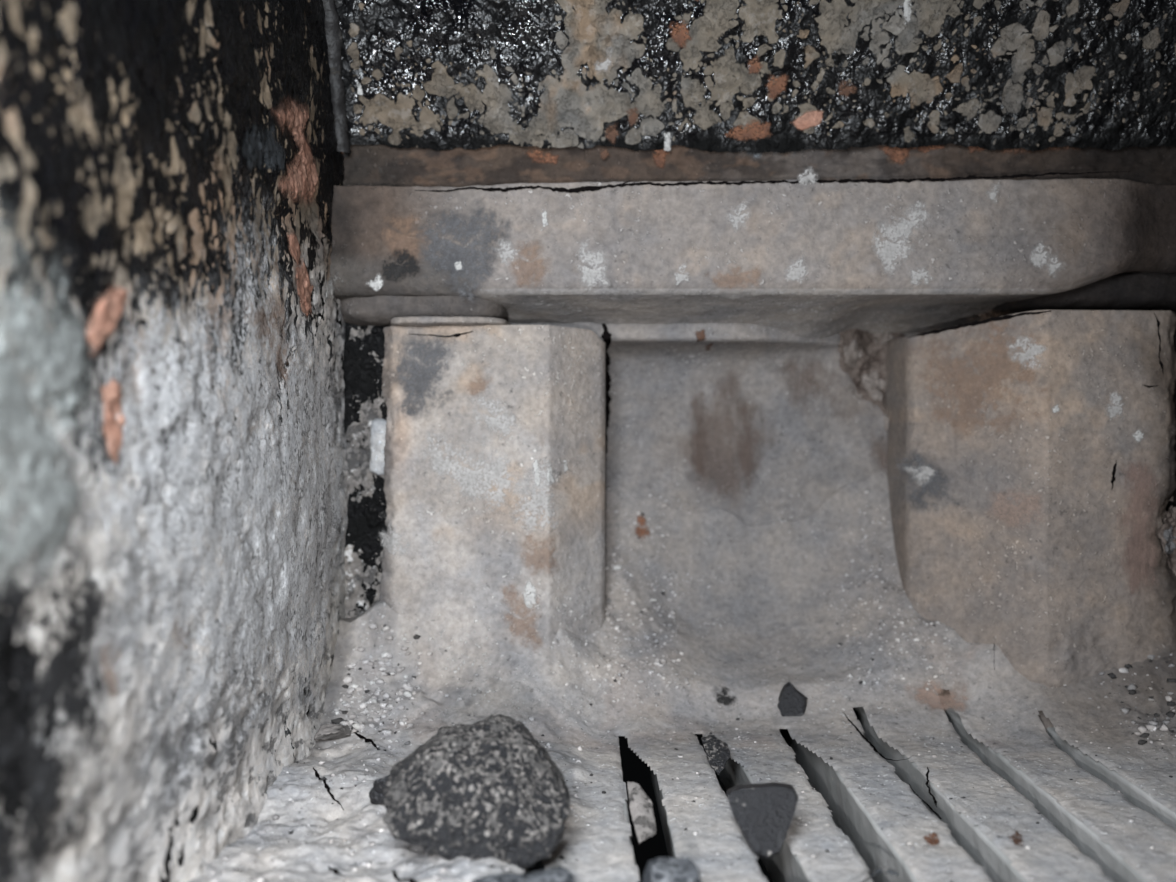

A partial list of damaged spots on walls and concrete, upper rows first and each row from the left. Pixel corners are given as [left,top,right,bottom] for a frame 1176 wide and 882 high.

corrosion [276,106,318,200]
crack [418,171,1130,193]
corrosion [288,234,313,316]
corrosion [88,287,127,349]
spalling [0,270,92,592]
corrosion [101,379,125,464]
crack [601,323,612,489]